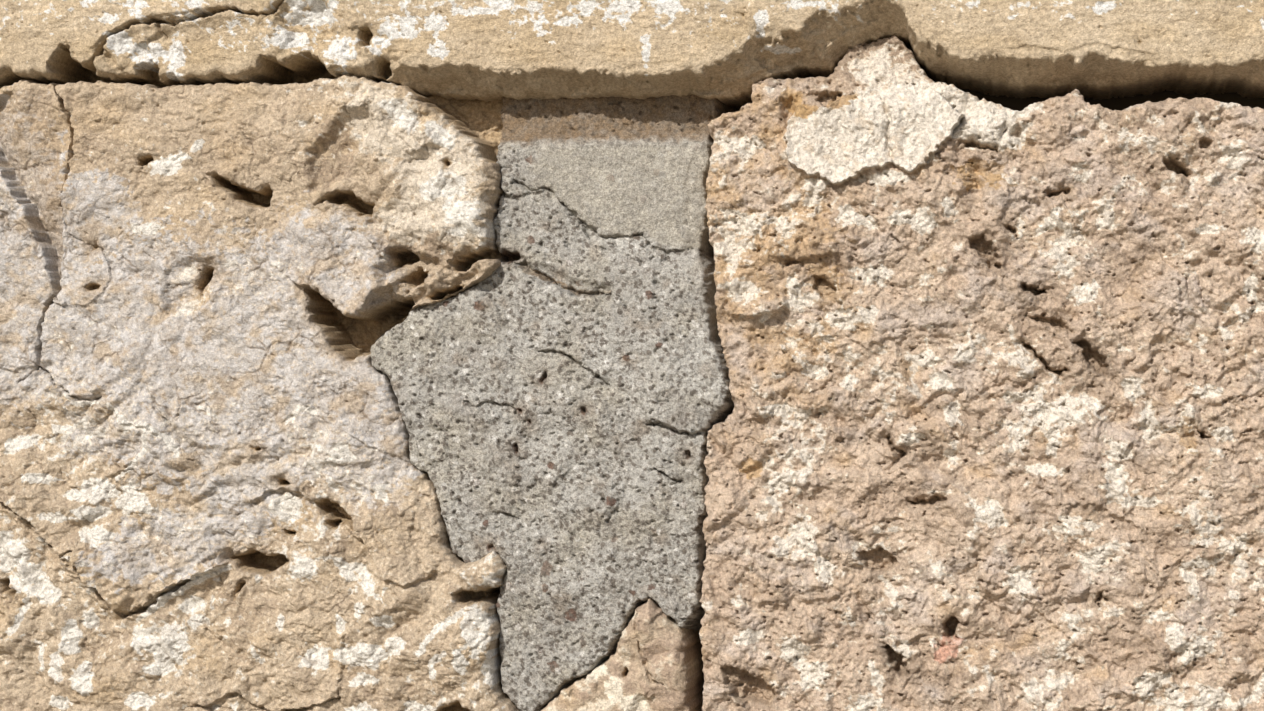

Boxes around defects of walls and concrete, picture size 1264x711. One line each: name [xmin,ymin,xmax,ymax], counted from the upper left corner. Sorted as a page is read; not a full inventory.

crack [91,0,286,63]
crack [500,168,694,255]
crack [0,85,115,402]
spalling [534,368,550,387]
spalling [508,404,536,459]
spalling [577,404,593,420]
spalling [680,446,695,465]
crack [0,502,192,620]
spalling [482,541,502,555]